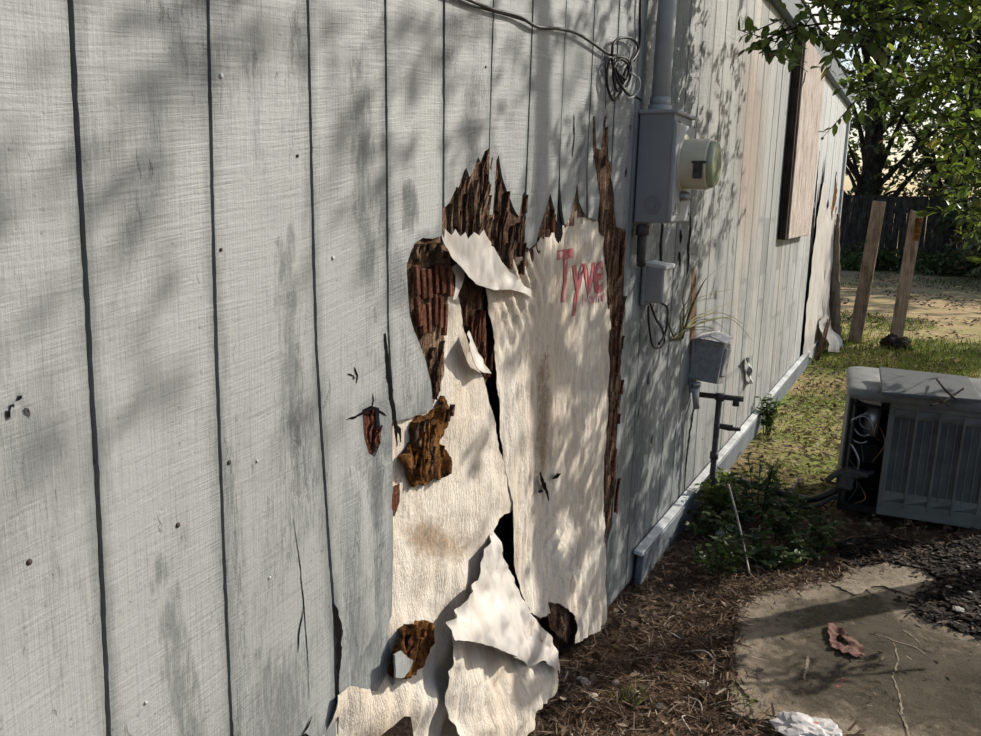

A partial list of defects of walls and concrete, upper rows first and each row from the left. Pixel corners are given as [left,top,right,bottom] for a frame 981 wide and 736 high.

peeling [412,149,529,400]
peeling [545,209,556,237]
peeling [618,231,626,279]
peeling [368,410,383,453]
peeling [404,404,455,483]
crack [293,518,309,686]
crack [333,603,343,734]
peeling [393,629,426,678]